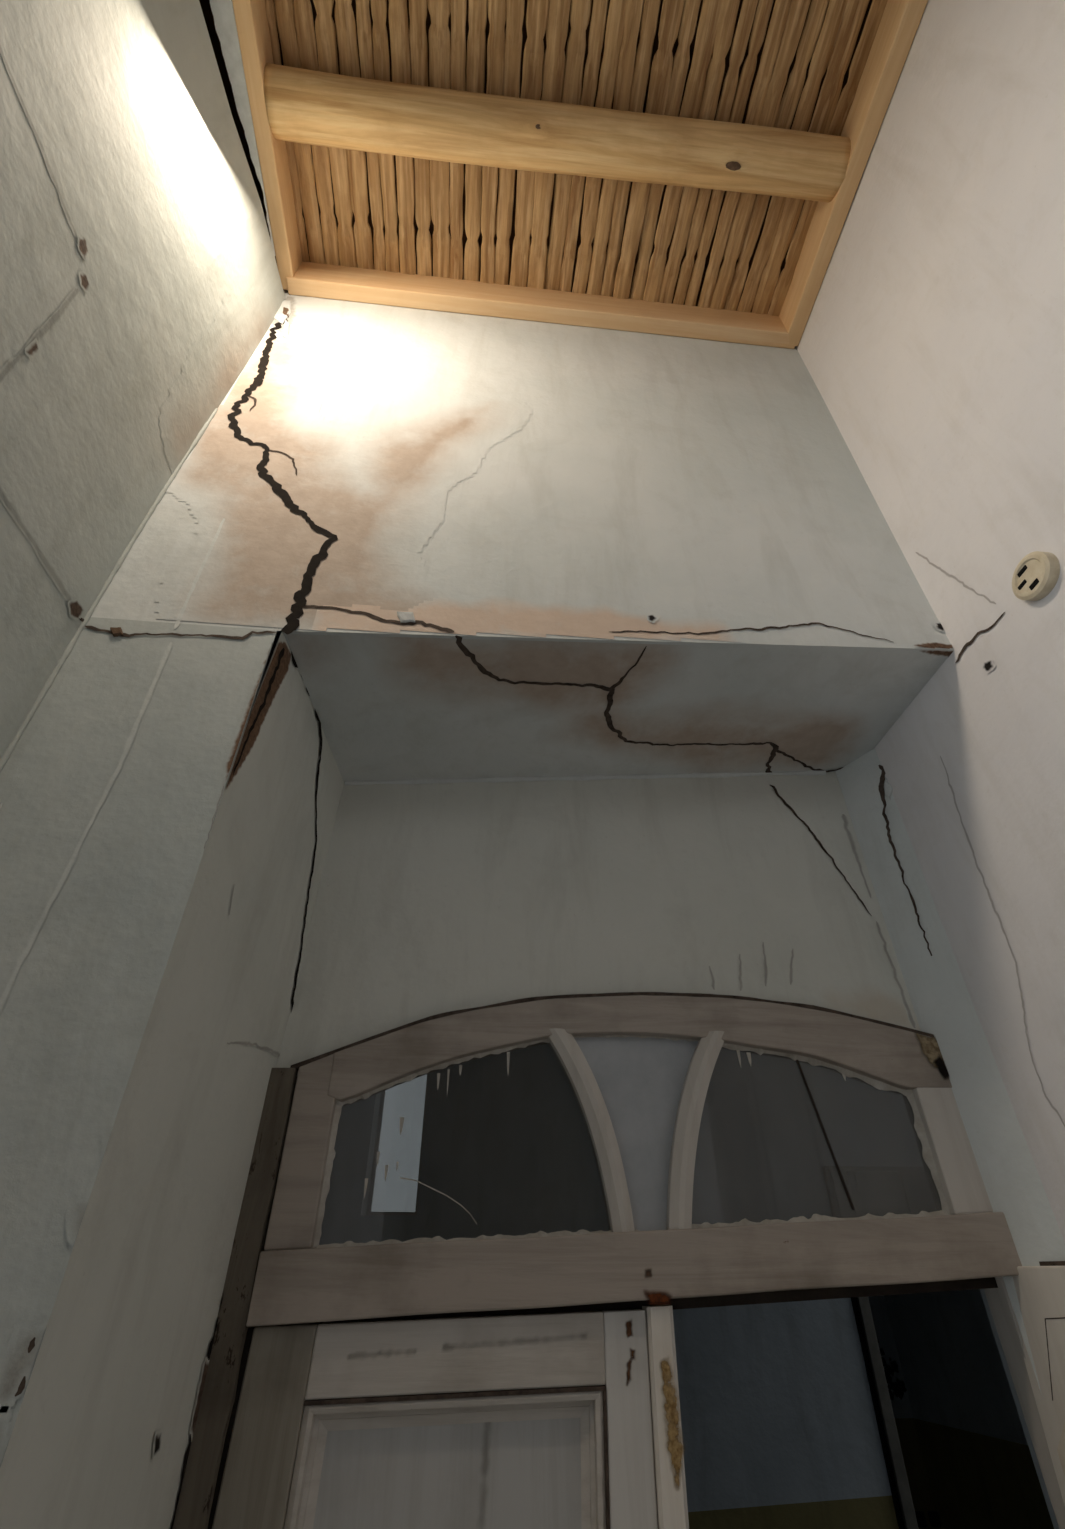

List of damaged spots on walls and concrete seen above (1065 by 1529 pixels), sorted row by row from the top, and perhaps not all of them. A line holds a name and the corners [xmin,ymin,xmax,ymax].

crack [0,43,78,241]
crack [0,287,932,1028]
damp [154,281,886,774]
crack [916,552,1005,663]
crack [227,1041,280,1057]
crack [940,756,1065,1127]